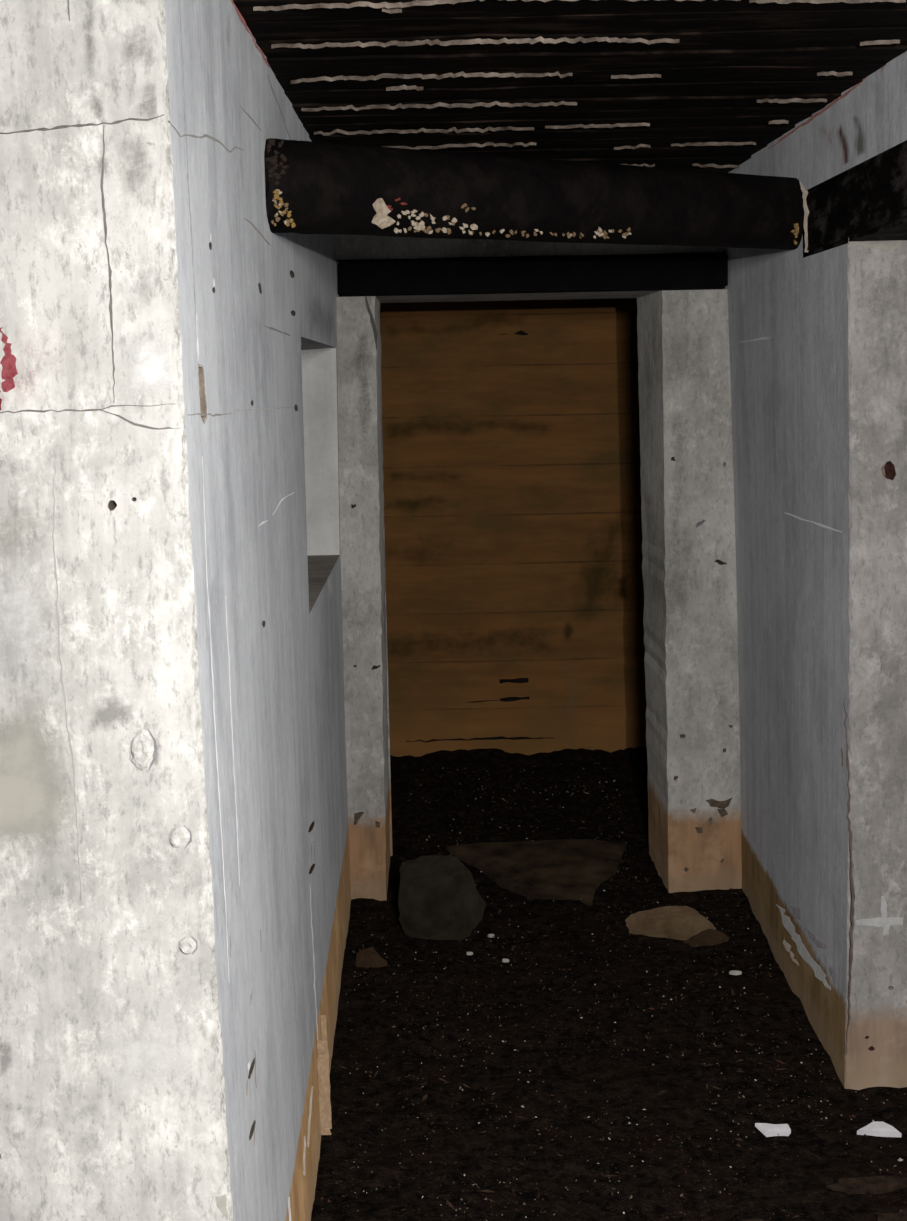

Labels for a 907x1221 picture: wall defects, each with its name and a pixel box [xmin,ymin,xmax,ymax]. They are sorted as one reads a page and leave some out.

crack [0,0,291,430]
peeling [372,198,631,239]